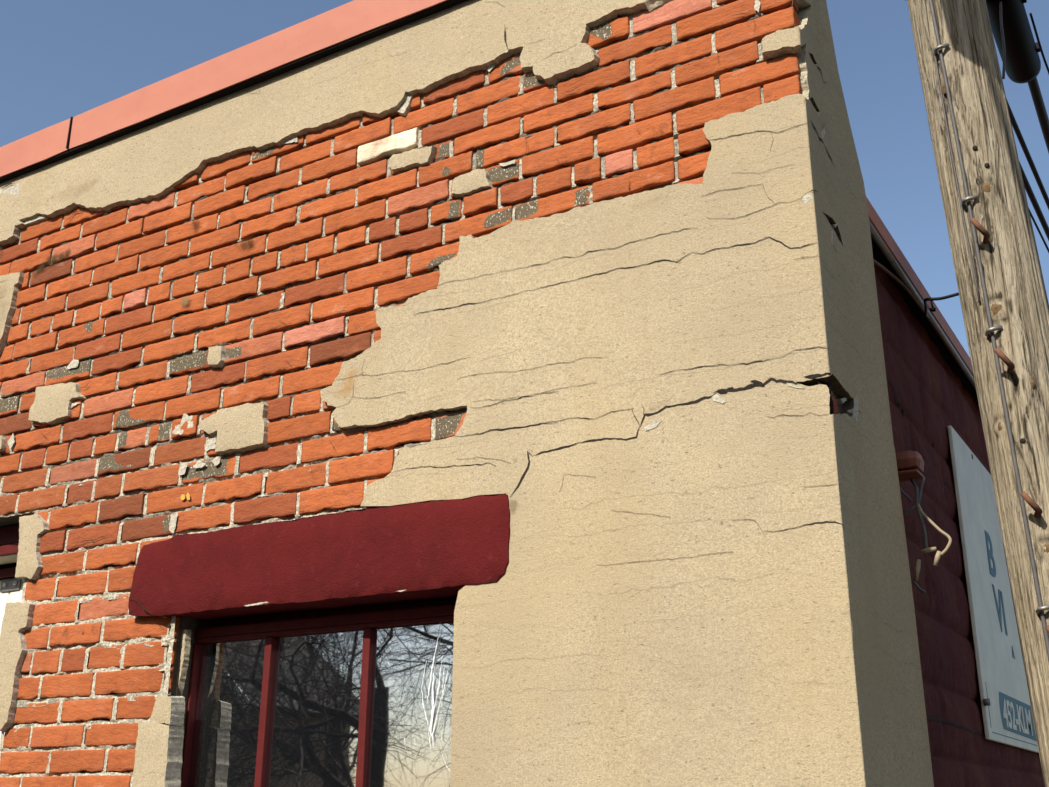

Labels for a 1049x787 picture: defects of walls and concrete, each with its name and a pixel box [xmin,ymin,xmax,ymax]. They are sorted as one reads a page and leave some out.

crack [703,121,833,219]
crack [417,228,851,314]
peeling [0,0,802,787]
crack [337,346,831,497]
crack [734,519,844,532]